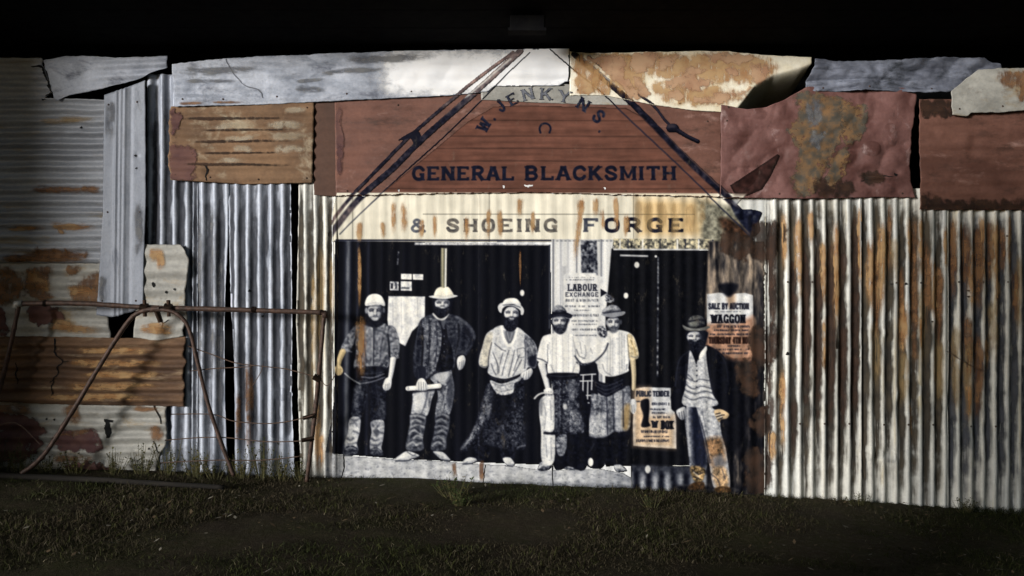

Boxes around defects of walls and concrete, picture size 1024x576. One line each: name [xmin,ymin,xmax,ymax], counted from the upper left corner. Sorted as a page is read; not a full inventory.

corrosion [573,52,778,106]
corrosion [168,102,314,184]
corrosion [53,223,89,234]
corrosion [381,204,407,235]
corrosion [487,211,502,234]
corrosion [518,199,535,231]
corrosion [575,198,629,252]
corrosion [0,247,187,470]
corrosion [720,209,1019,494]